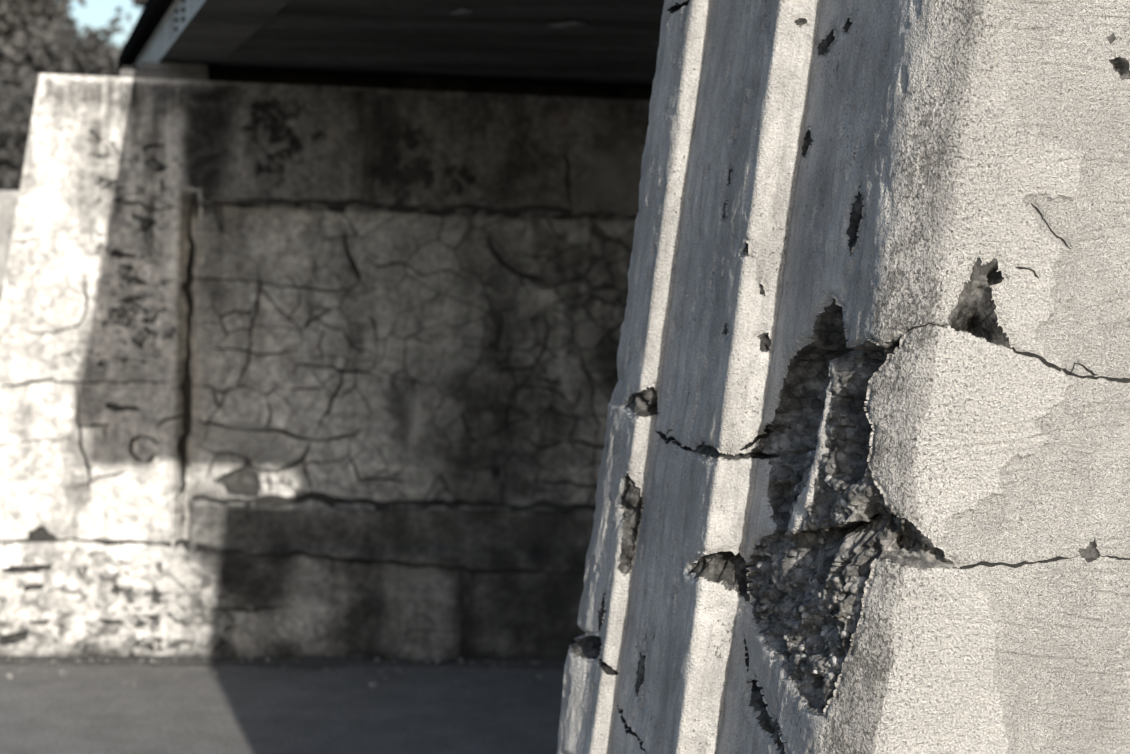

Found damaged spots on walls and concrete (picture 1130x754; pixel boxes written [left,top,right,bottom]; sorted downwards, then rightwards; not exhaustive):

crack [667,0,690,14]
water stain [183,85,326,214]
crack [0,230,470,500]
water stain [597,349,618,392]
flaking render [688,0,1085,754]
crack [1005,346,1130,383]
crack [655,429,692,451]
crack [740,423,780,460]
spalling [618,473,644,576]
water stain [64,643,153,659]
water stain [344,591,408,661]
water stain [443,554,585,662]